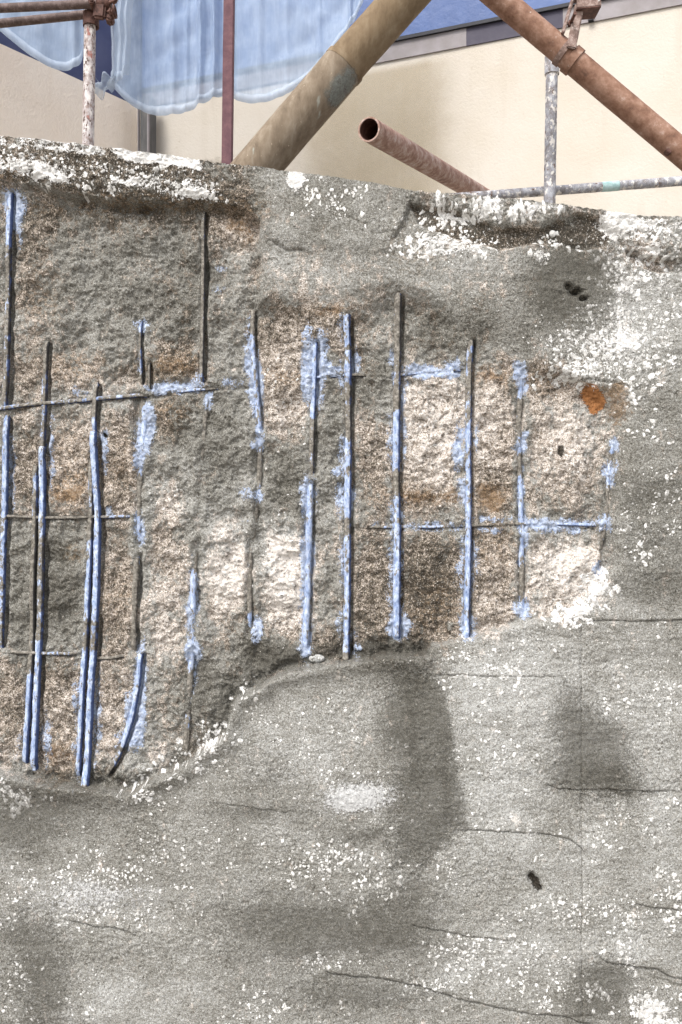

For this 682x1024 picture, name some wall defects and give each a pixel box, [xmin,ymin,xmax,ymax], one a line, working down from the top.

spalling [0,136,682,833]
peeling [0,814,220,940]